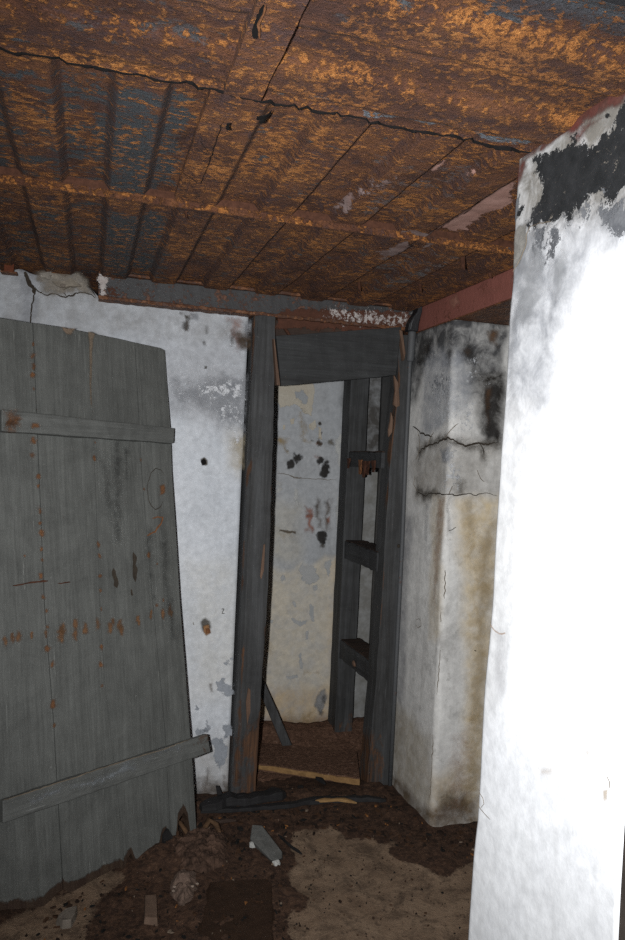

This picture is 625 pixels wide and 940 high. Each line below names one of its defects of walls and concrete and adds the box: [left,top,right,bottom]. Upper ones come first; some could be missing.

spalling [37,271,109,295]
peeling [276,305,410,333]
water stain [287,454,301,469]
water stain [317,437,333,478]
crack [413,423,497,497]
water stain [317,531,327,547]
peeling [216,678,234,697]
peeling [195,721,232,768]